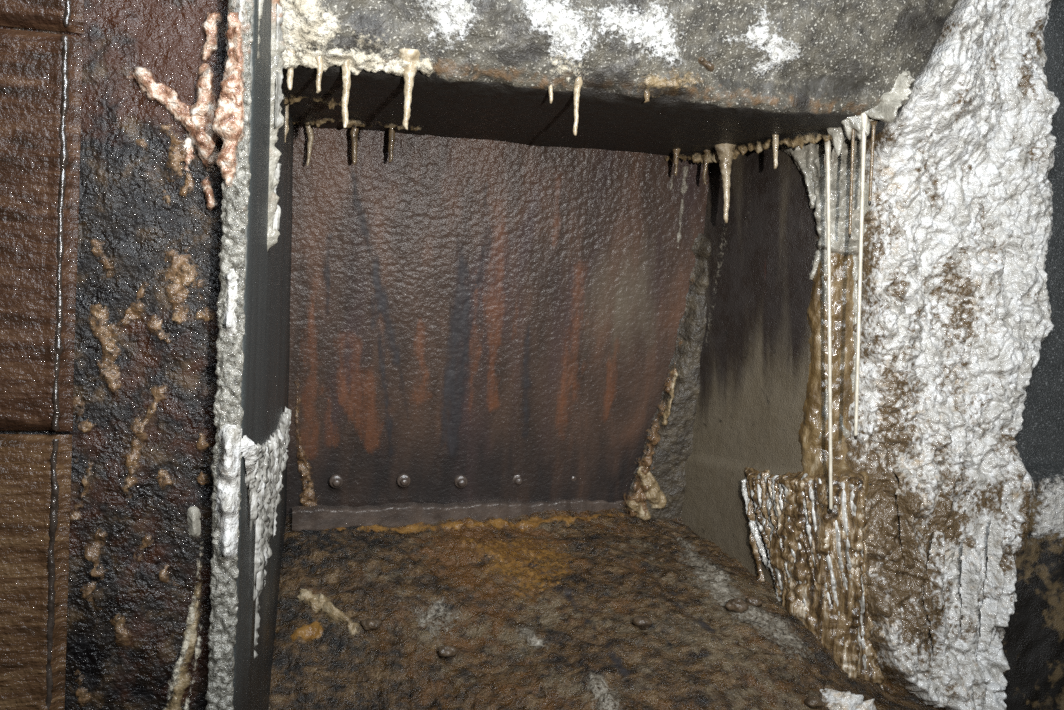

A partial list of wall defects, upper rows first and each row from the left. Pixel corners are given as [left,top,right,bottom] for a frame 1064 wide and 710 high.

water stain [505,0,704,91]
water stain [664,151,720,248]
water stain [127,0,434,710]
water stain [677,0,1064,710]
efflorescence [623,363,678,521]